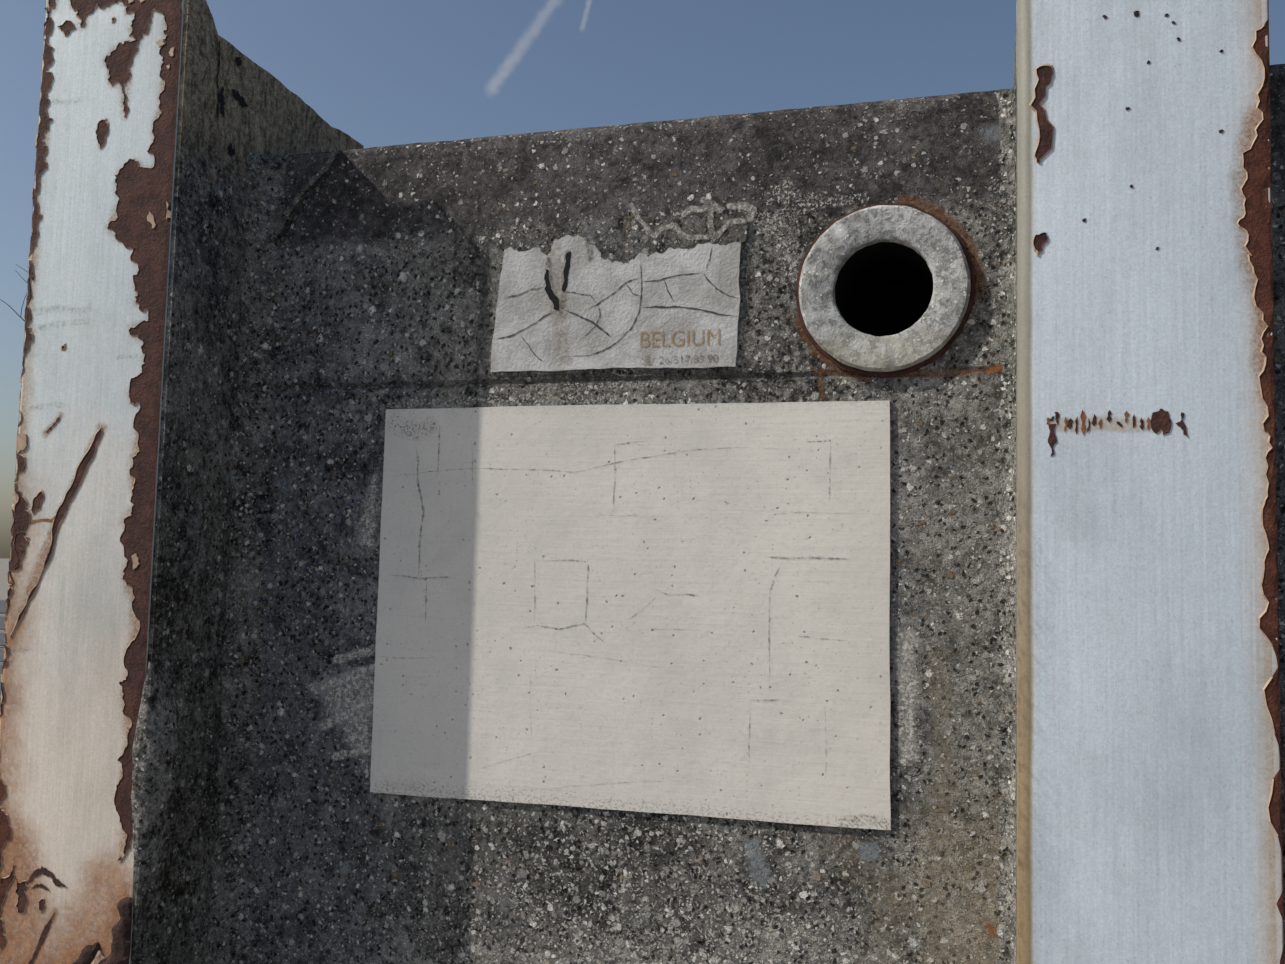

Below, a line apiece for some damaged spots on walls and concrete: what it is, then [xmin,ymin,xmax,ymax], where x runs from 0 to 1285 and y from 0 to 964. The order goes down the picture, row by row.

crack [493,248,737,361]
rust [795,198,1003,399]
peeling [0,0,183,862]
rust [0,829,39,964]
peeling [0,776,67,950]
rust [55,864,131,964]